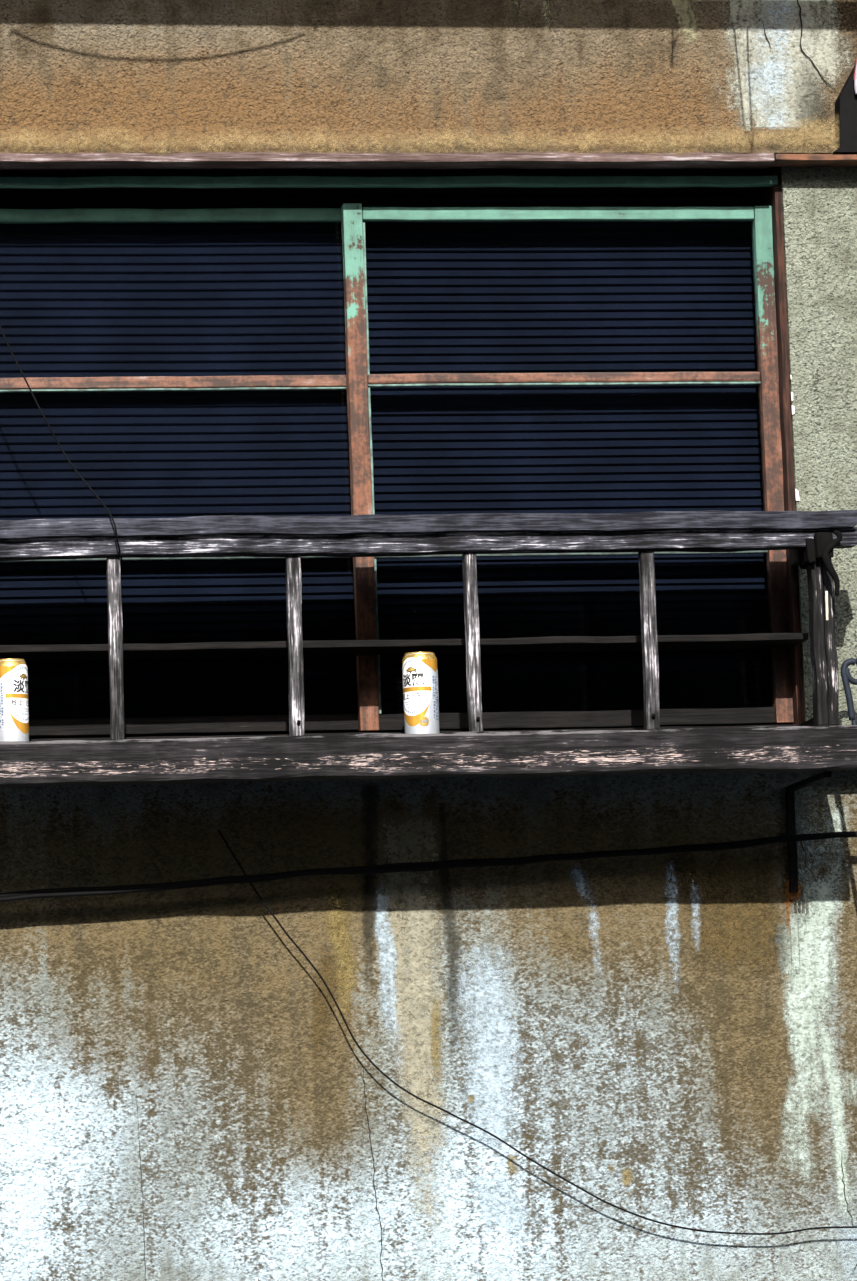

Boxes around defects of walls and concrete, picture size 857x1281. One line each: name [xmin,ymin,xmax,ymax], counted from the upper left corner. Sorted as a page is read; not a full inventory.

leakage [671,0,698,41]
leakage [727,0,849,131]
crack [762,0,836,91]
leakage [666,865,678,953]
leakage [363,785,521,1215]
leakage [776,810,857,1272]